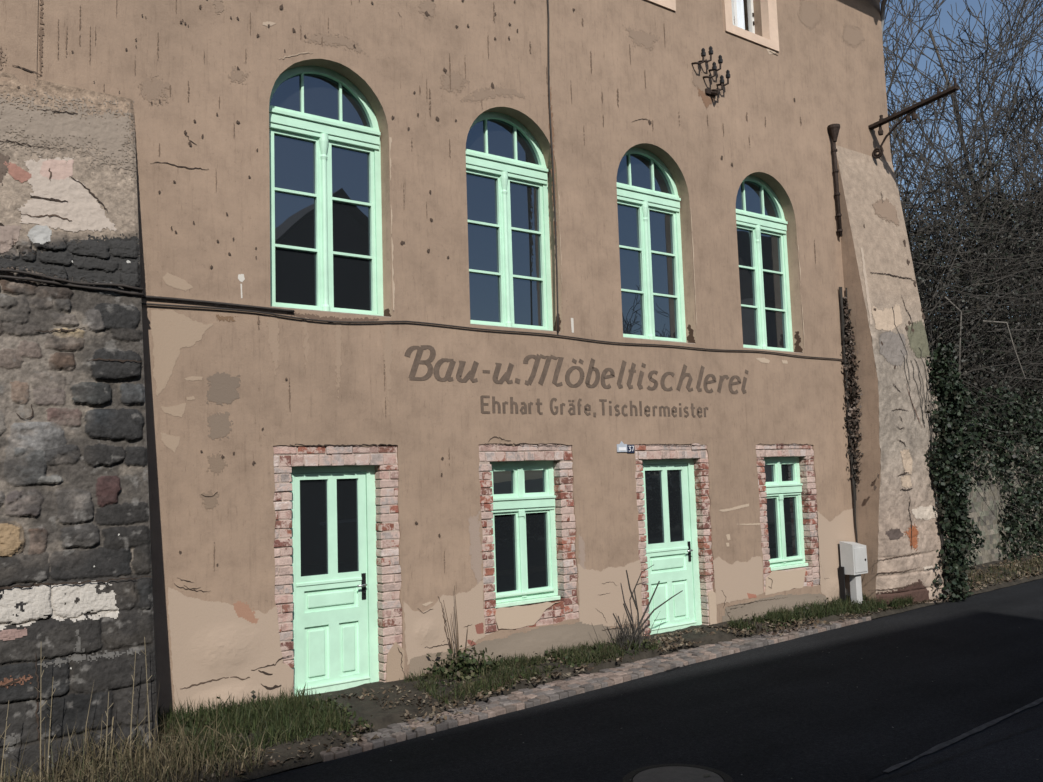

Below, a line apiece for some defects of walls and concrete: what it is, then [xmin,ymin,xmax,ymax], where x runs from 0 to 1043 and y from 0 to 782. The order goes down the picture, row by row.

crack [150,133,207,170]
spalling [0,156,117,253]
peeling [0,582,119,641]
peeling [168,587,294,714]
crack [181,655,292,700]
peeling [386,580,558,682]
peeling [577,560,643,638]
peeling [708,508,855,625]